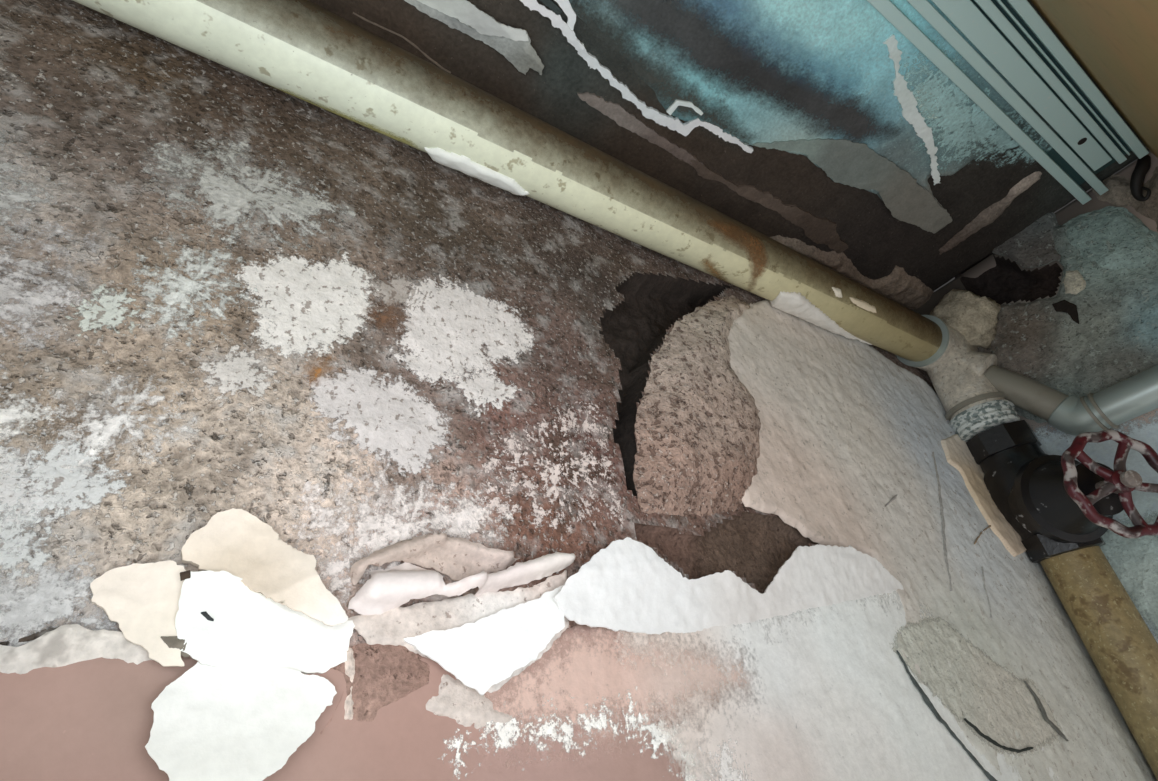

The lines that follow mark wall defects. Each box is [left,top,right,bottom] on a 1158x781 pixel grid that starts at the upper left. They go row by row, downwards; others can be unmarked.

peeling [404,0,544,75]
peeling [424,147,529,196]
leakage [570,0,902,143]
peeling [520,0,952,234]
leakage [891,41,1052,172]
flaking render [955,253,1063,305]
leakage [0,129,626,603]
leakage [0,364,197,647]
peeling [0,508,904,781]
crack [896,650,1069,781]